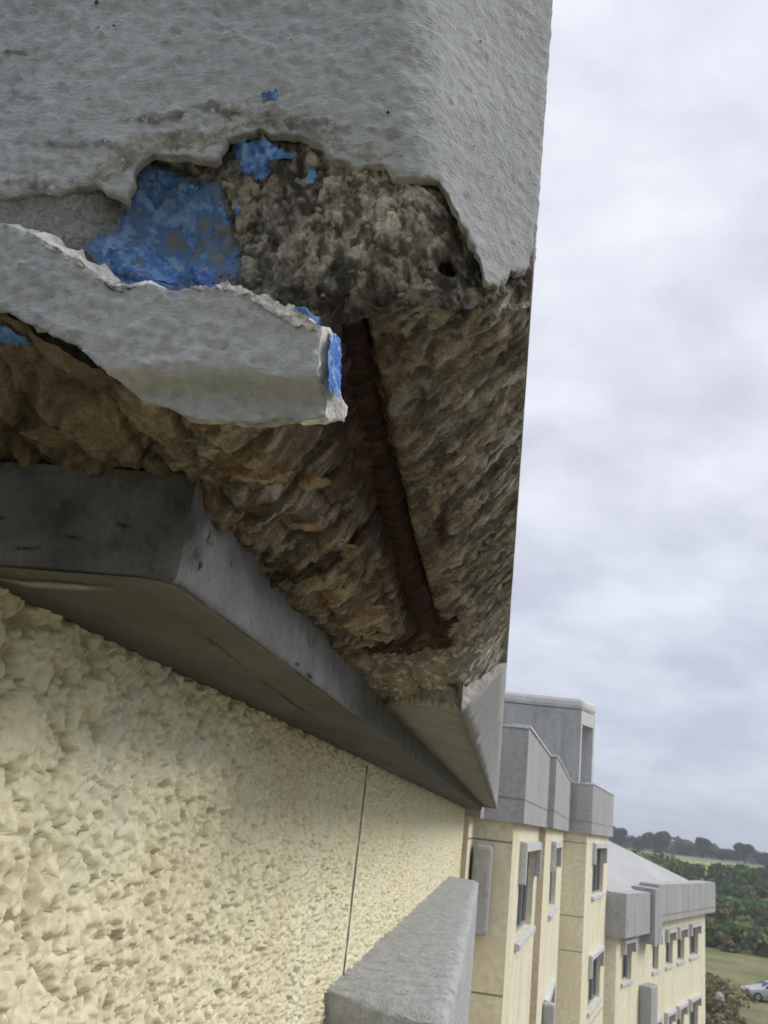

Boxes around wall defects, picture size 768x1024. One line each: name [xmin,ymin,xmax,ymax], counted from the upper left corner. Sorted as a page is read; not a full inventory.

spalling [0,117,532,397]
peeling [229,469,332,491]
peeling [292,514,326,531]
rust [270,317,460,655]
crack [343,765,368,975]